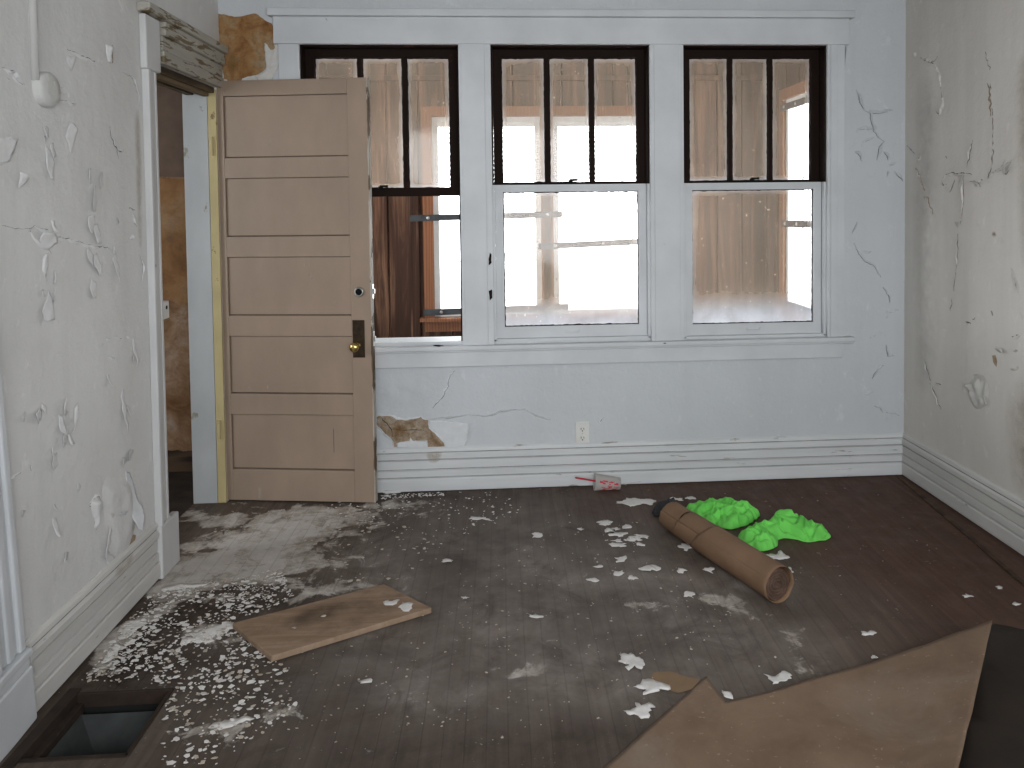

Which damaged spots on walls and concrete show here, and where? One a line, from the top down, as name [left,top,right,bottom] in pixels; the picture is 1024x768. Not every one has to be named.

flaking render [218,13,278,81]
crack [855,51,1012,326]
crack [2,206,145,280]
crack [852,223,900,416]
flaking render [376,415,469,448]
crack [433,370,549,420]